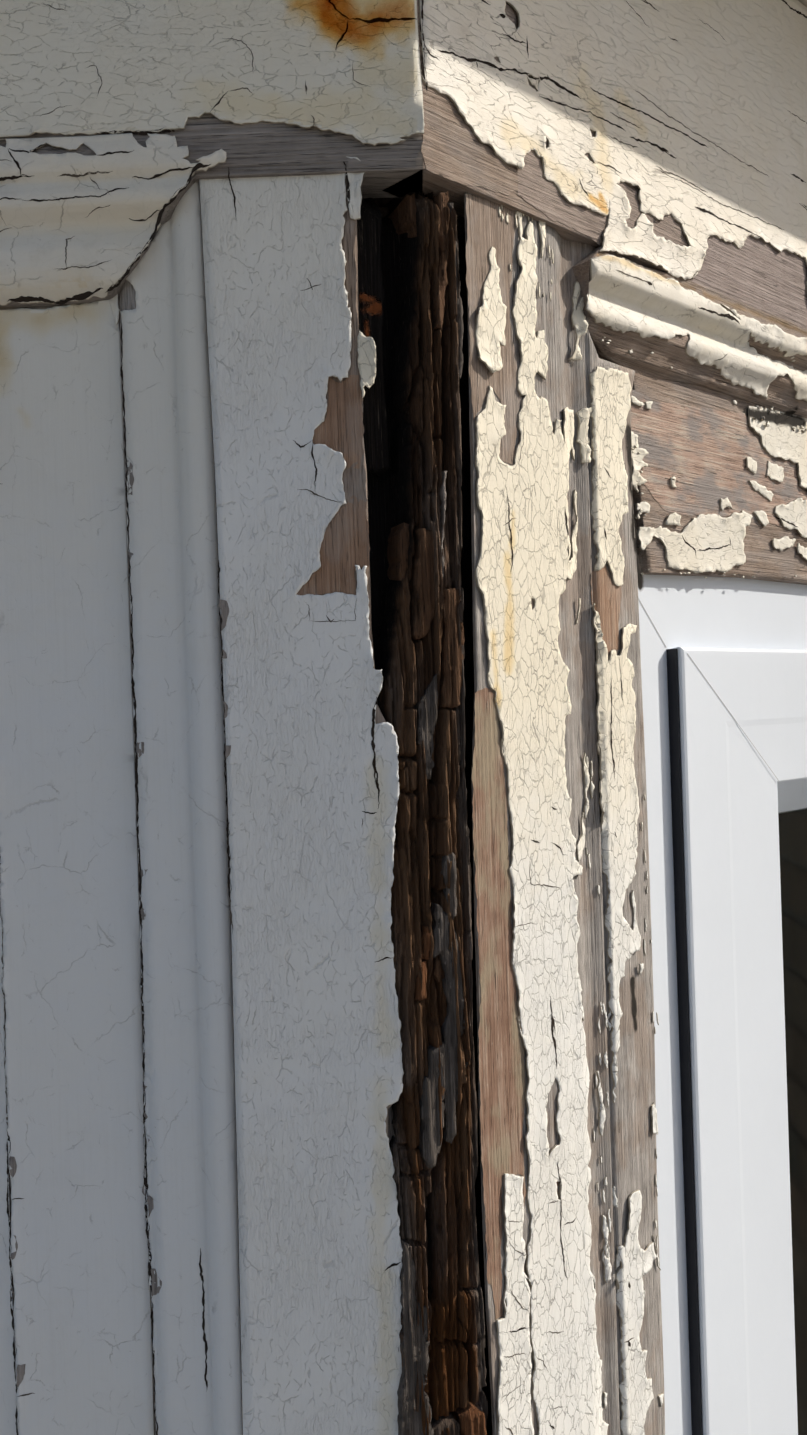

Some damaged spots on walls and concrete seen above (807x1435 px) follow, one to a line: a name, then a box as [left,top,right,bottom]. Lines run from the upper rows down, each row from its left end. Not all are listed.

peeling [35,144,96,156]
crack [328,0,807,237]
peeling [618,182,688,247]
peeling [691,236,807,329]
peeling [166,82,606,595]
crack [698,307,740,361]
crack [293,440,337,502]
crack [309,599,357,622]
crack [362,697,380,825]
peeling [568,281,807,1435]
peeling [471,688,534,1435]
peeling [547,1080,558,1150]